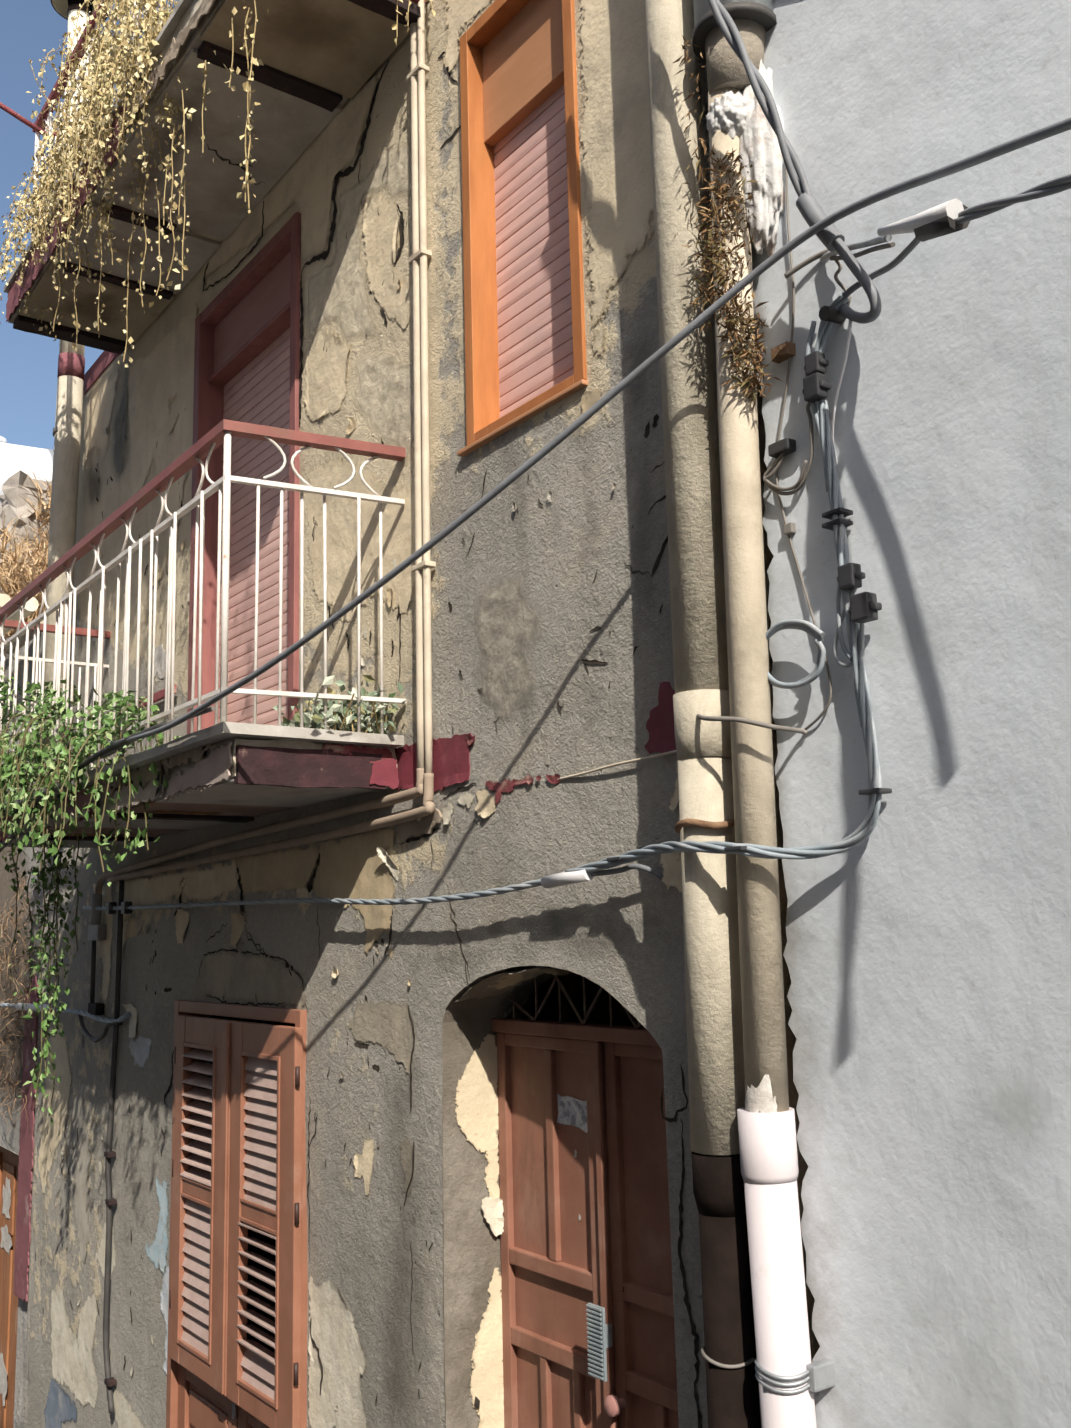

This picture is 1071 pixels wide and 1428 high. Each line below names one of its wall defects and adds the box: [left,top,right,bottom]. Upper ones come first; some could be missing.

crack [203,145,265,291]
crack [299,60,389,426]
peeling [635,681,679,813]
crack [206,924,275,962]
peeling [93,726,569,1068]
peeling [660,852,682,893]
peeling [33,1020,169,1374]
peeling [455,1034,504,1237]
crack [661,1062,702,1428]
peeling [44,1288,143,1428]
peeling [308,1276,377,1428]
peeling [469,1267,504,1428]